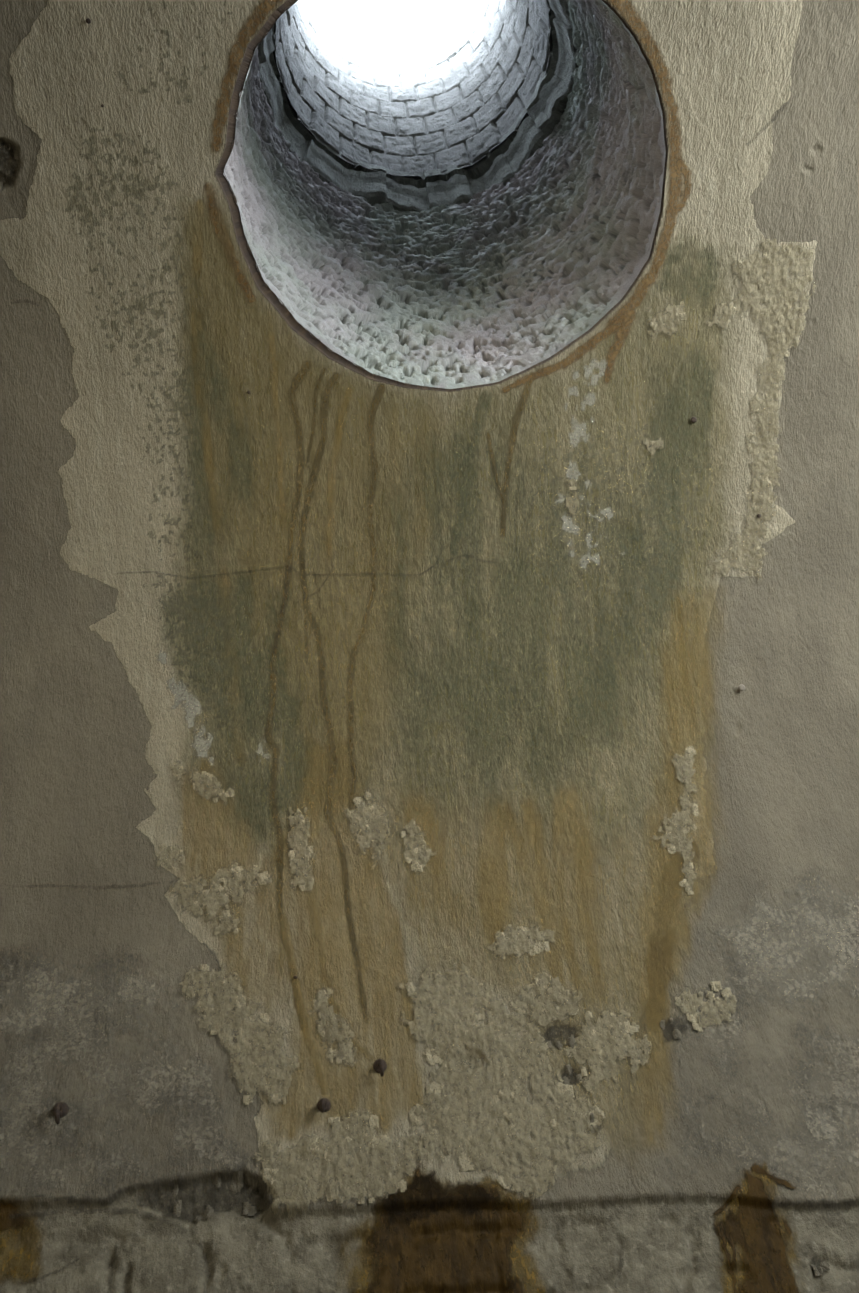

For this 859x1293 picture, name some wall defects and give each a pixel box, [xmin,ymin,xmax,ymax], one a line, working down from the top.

corrosion [211,0,284,152]
spalling [0,139,19,191]
corrosion [502,0,692,393]
corrosion [205,184,256,303]
peeling [294,371,330,463]
peeling [304,390,372,660]
damp [105,201,728,1143]
peeling [0,961,168,1036]
peeling [660,981,737,1042]
spalling [139,1171,273,1222]
peeling [415,1145,501,1190]